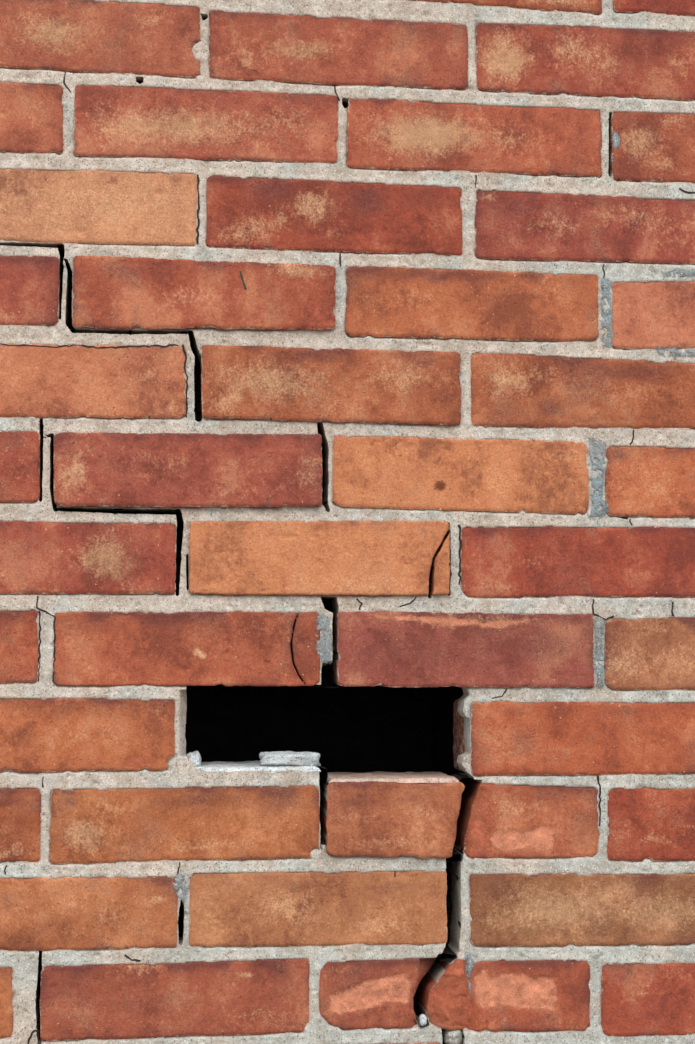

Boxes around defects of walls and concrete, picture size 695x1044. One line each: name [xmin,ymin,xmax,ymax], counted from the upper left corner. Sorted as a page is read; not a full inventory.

crack [0,244,202,422]
crack [317,428,328,505]
crack [40,425,188,596]
crack [36,596,56,682]
crack [290,616,339,688]
crack [321,598,363,613]
crack [400,522,462,607]
spalling [186,751,201,767]
crack [317,766,328,847]
crack [177,899,185,938]
crack [413,774,473,1016]
crack [27,951,42,1044]